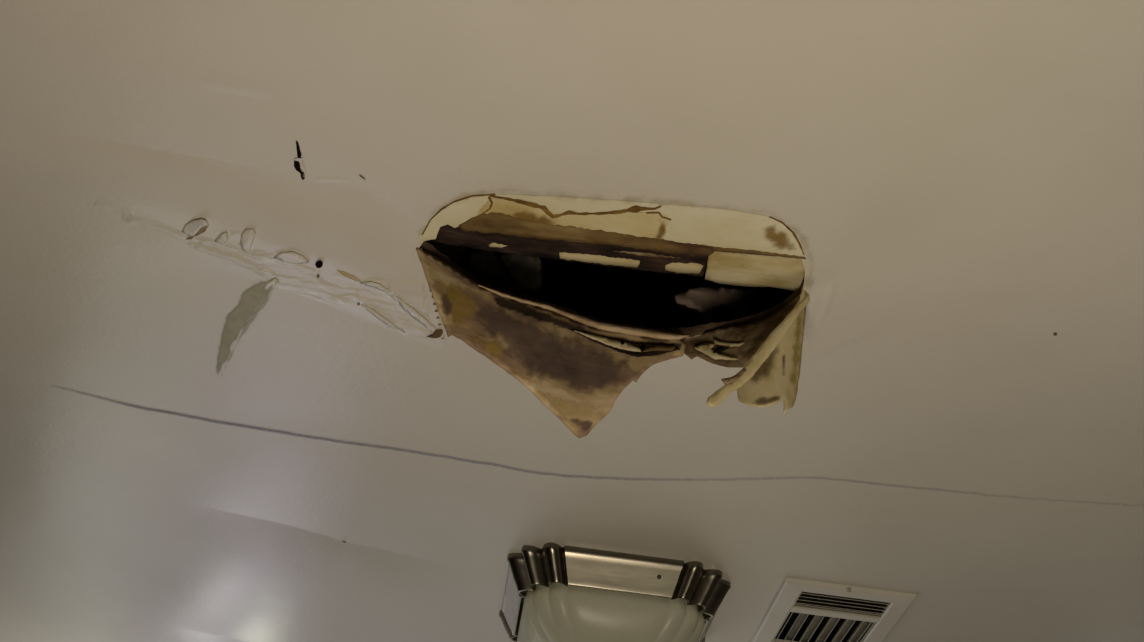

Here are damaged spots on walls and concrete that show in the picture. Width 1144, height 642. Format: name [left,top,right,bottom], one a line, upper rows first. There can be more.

crack [293,141,366,182]
peeling [182,219,256,253]
peeling [419,194,807,337]
damp [439,284,681,388]
damp [752,317,801,383]